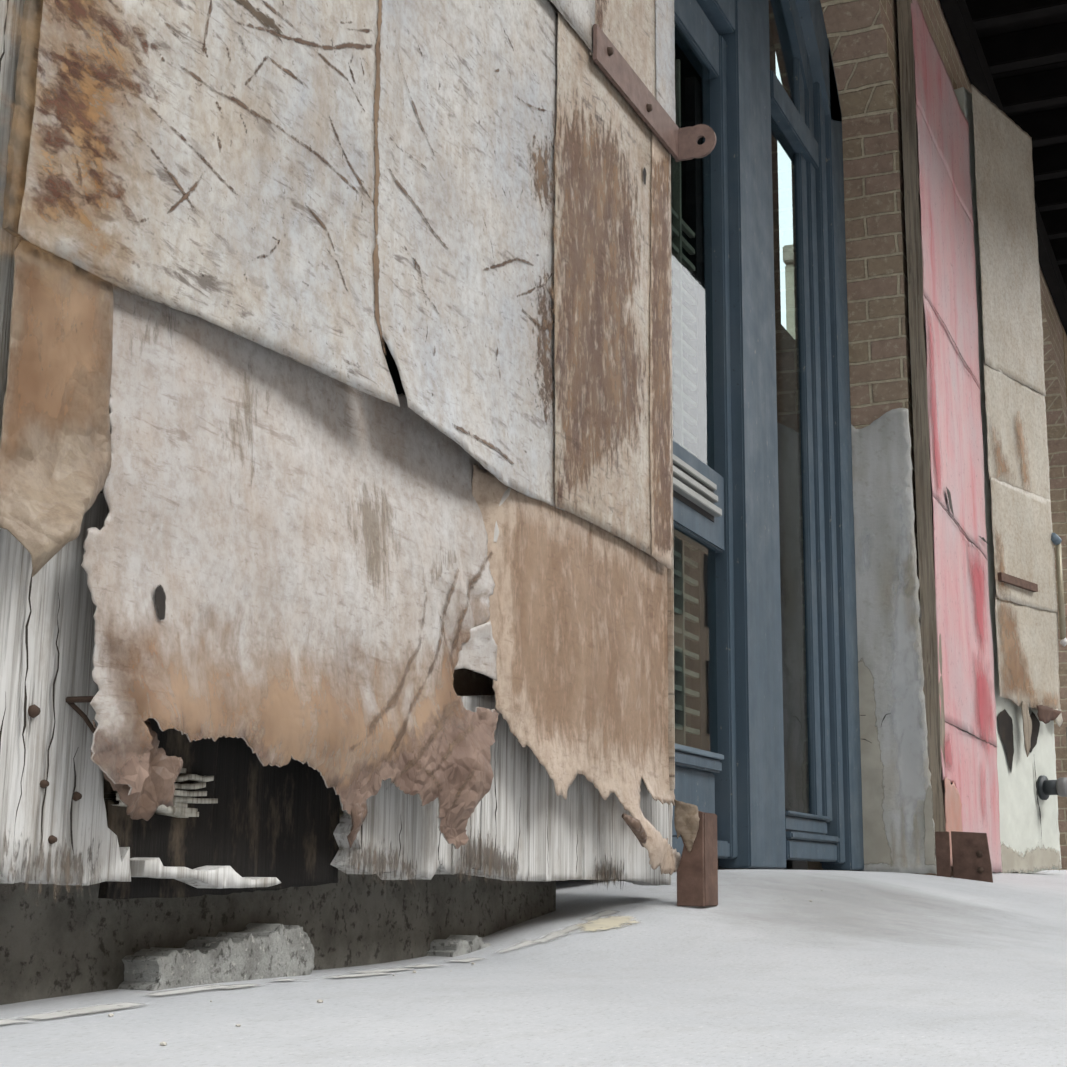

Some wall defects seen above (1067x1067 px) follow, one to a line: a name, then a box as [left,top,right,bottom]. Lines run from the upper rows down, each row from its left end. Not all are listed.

crack [0,0,9,71]
corrosion [24,0,157,254]
corrosion [236,0,282,42]
corrosion [529,107,673,552]
crack [0,569,79,861]